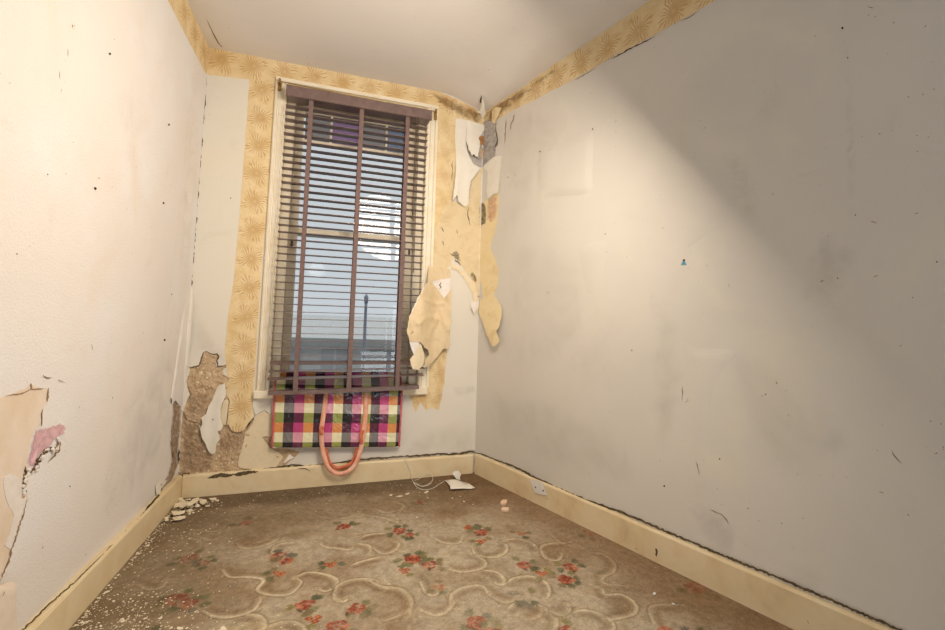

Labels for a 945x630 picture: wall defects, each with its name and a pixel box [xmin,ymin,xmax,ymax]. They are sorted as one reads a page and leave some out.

flaking render [433,168,502,346]
flaking render [0,384,48,579]
flaking render [178,351,305,479]